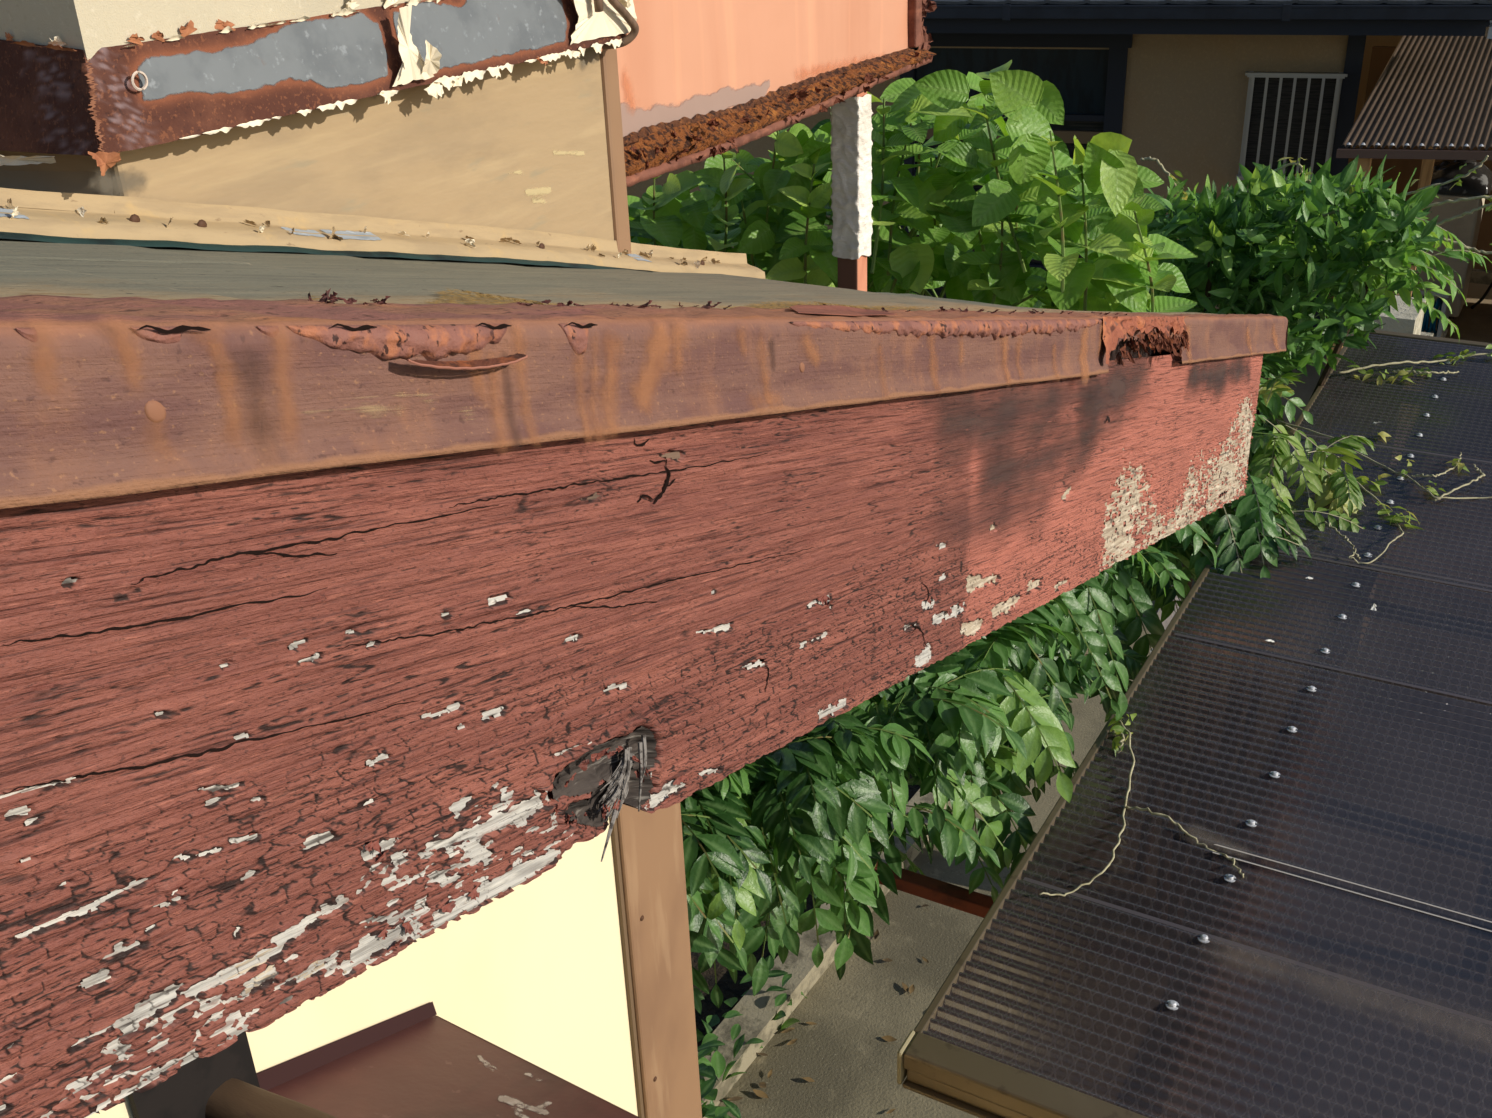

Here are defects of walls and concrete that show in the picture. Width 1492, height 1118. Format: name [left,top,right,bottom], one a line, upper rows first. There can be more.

rust [85,57,105,152]
peeling [125,0,637,139]
rust [624,49,936,177]
peeling [1099,392,1254,573]
crack [5,438,813,649]
peeling [903,573,1067,636]
peeling [603,682,627,692]
peeling [818,698,846,719]
peeling [914,643,931,667]
peeling [0,777,76,826]
peeling [15,878,148,938]
peeling [40,742,718,1118]